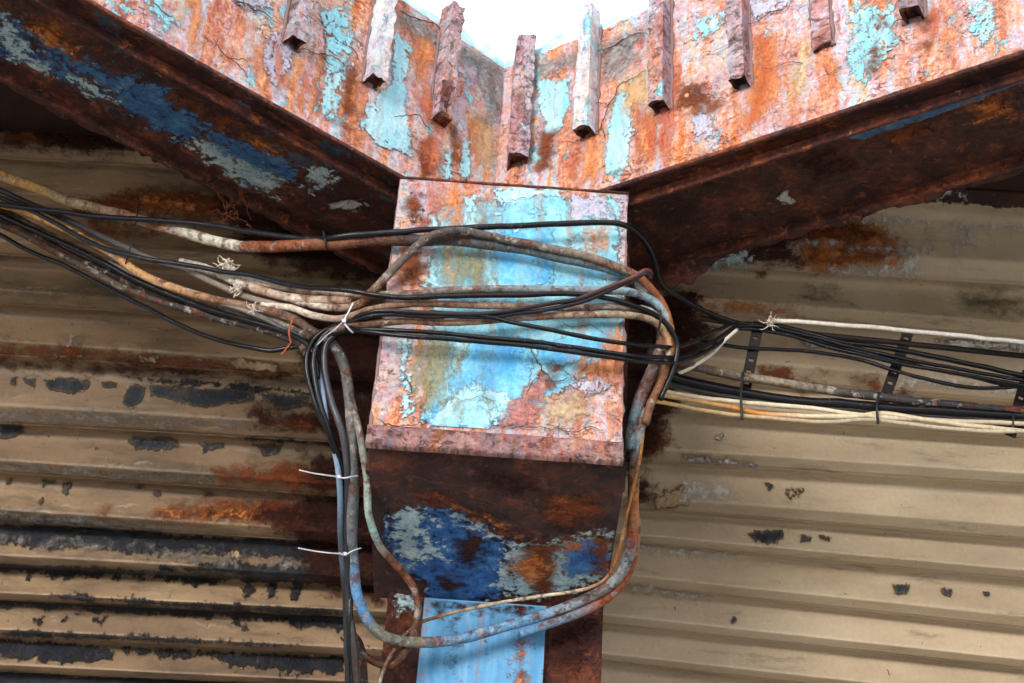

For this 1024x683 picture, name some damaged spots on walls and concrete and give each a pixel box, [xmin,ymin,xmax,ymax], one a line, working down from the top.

peeling [10,353,310,411]
peeling [0,12,341,202]
rust [0,306,383,605]
rust [0,81,386,289]
peeling [394,246,624,429]
peeling [401,137,625,264]
rust [576,284,681,471]
rust [736,33,811,133]
rust [645,168,1024,355]
peeling [0,464,344,683]
peeling [381,505,614,616]
rust [412,490,614,620]